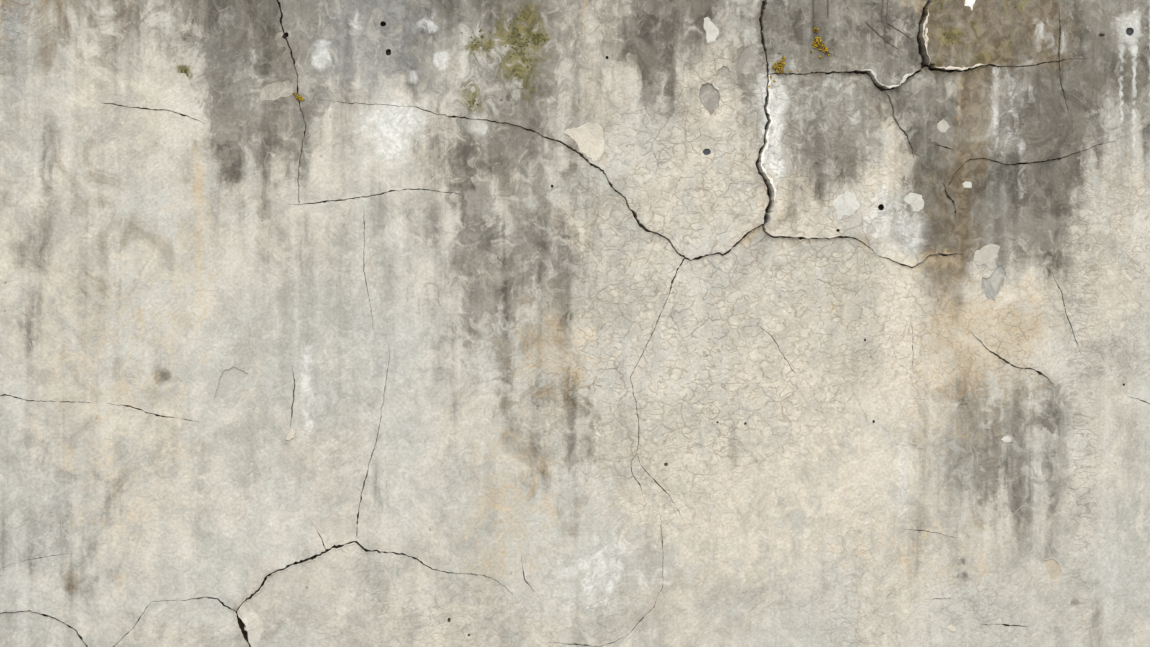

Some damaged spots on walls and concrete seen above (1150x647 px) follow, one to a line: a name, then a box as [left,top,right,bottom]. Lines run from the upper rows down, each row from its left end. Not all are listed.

water stain [148,0,652,647]
peeling [563,122,608,168]
crack [276,0,1066,288]
flaking render [699,0,1002,250]
water stain [595,0,1150,586]
spalling [973,244,1006,301]
crack [2,351,532,647]
water stain [1044,563,1119,647]